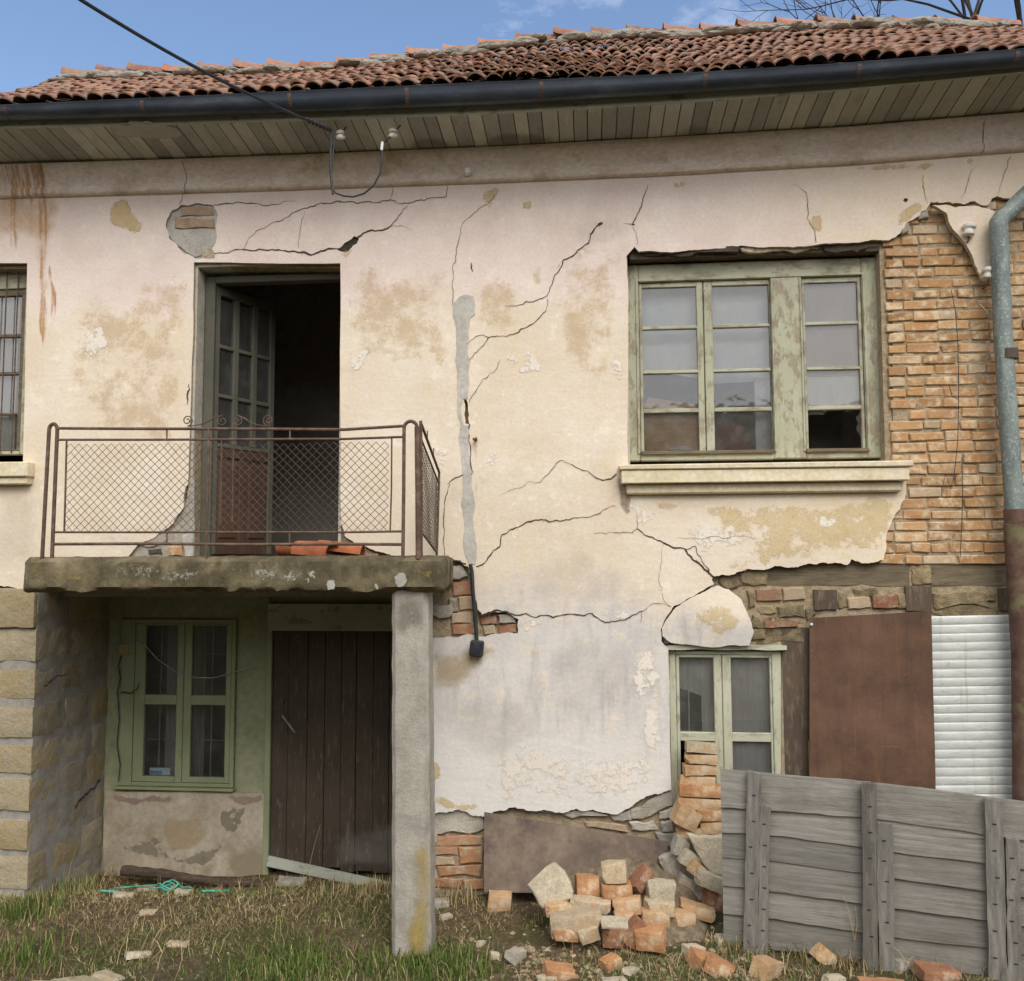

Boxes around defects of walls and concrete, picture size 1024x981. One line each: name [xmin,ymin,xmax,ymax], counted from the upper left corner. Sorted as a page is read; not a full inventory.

rust [3,164,47,235]
flaking render [167,204,218,259]
crack [206,186,448,257]
crack [452,194,495,305]
rust [39,263,56,341]
flaking render [690,198,1024,565]
crack [443,225,754,623]
flaking render [451,581,540,635]
peeling [633,650,663,750]
peeling [436,798,477,810]